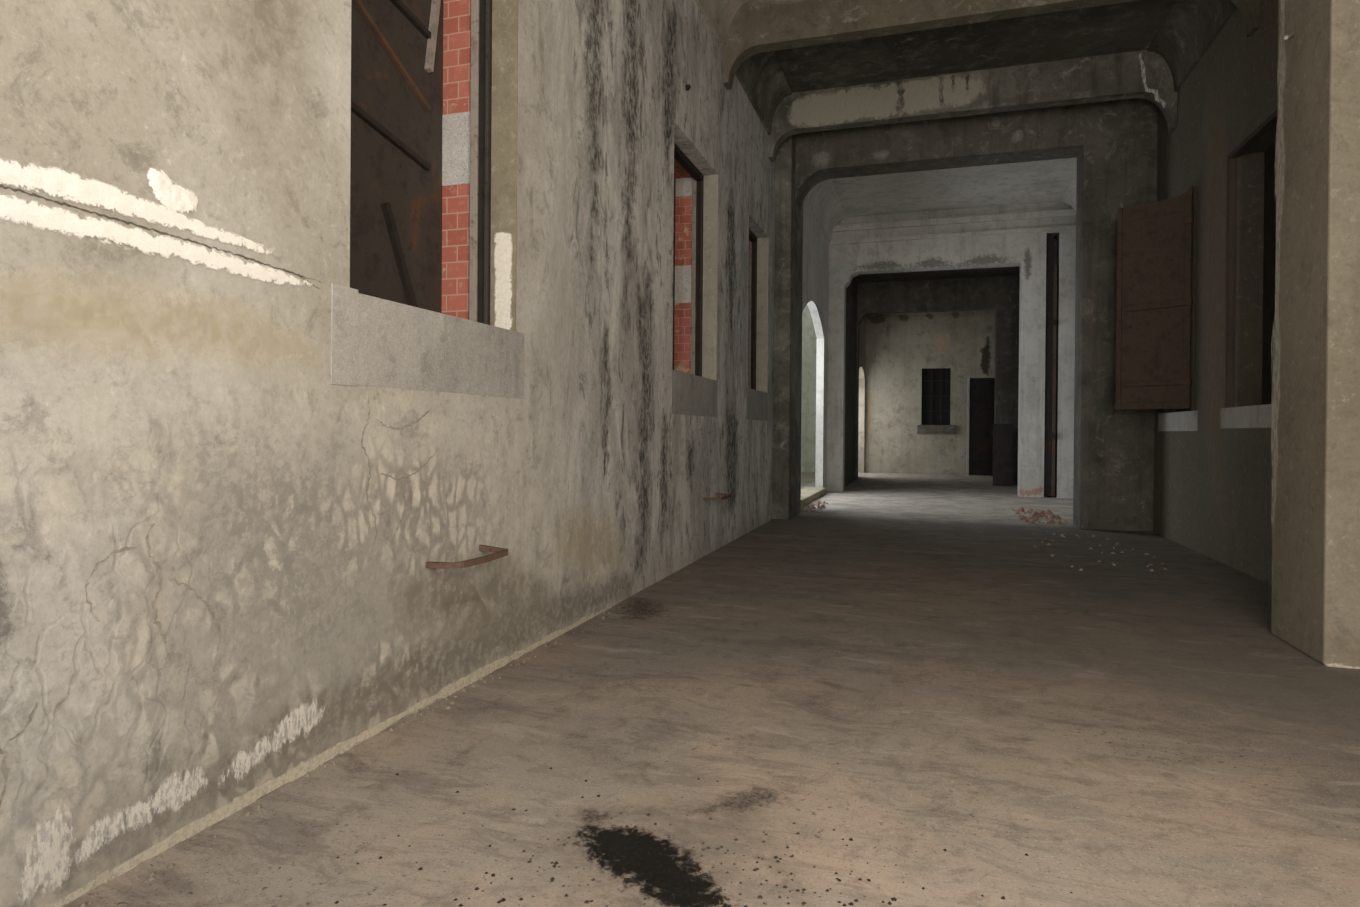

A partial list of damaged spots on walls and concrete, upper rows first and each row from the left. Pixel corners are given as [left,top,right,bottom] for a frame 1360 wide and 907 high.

damp [0,0,668,907]
crack [85,524,221,671]
crack [0,703,38,806]